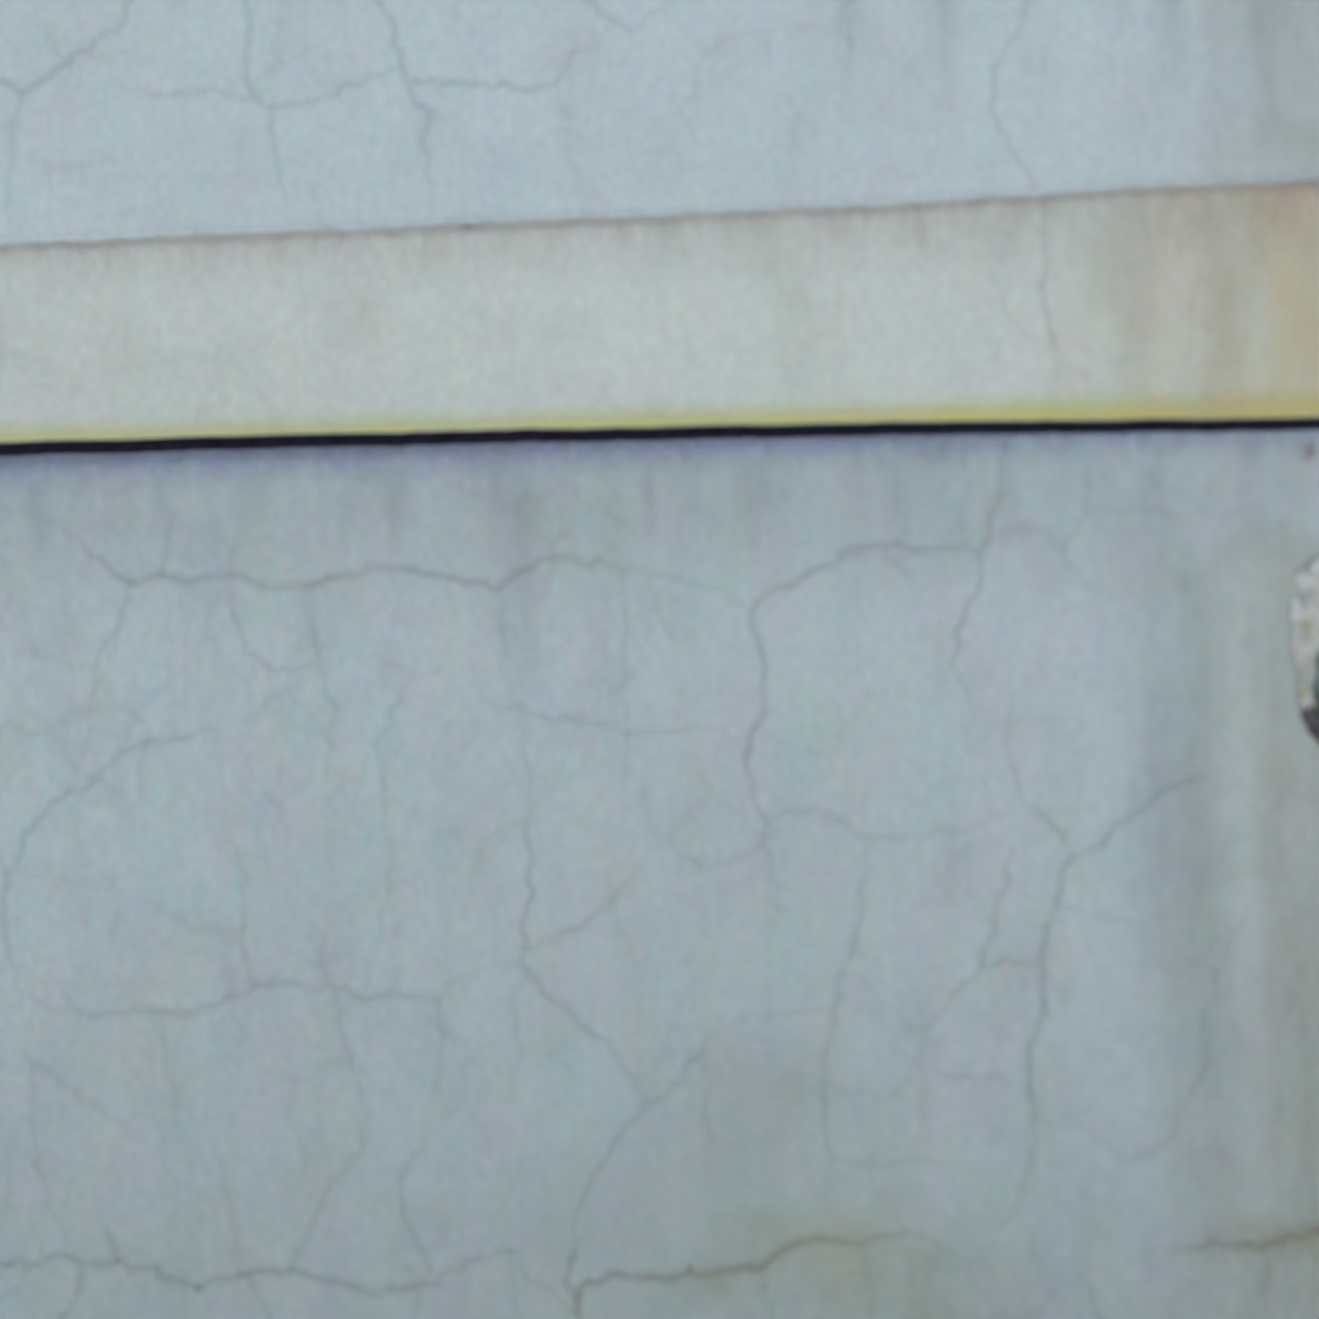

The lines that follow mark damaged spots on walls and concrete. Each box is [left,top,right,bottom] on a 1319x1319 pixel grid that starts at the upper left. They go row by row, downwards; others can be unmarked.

spalling [1290,558,1319,742]